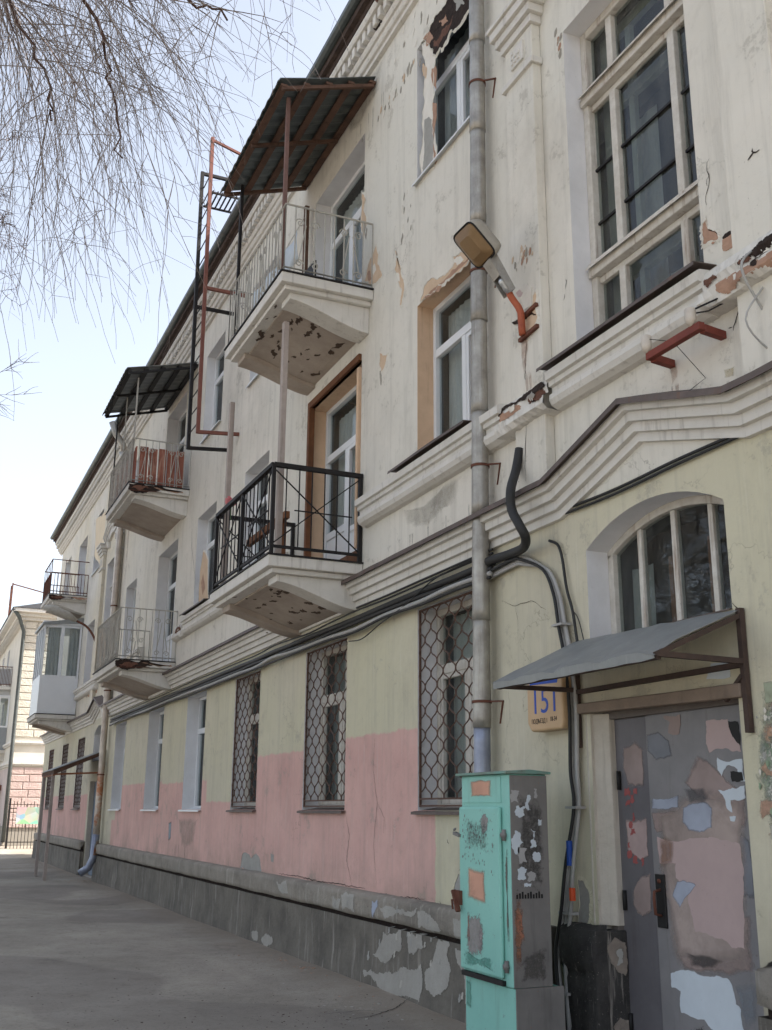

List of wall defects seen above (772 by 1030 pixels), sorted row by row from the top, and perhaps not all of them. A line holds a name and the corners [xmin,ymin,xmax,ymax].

peeling [360,190,411,308]
spalling [699,216,732,251]
spalling [737,233,772,266]
spalling [419,251,469,302]
spalling [498,382,545,417]
spalling [251,931,273,946]
spalling [363,906,466,1004]